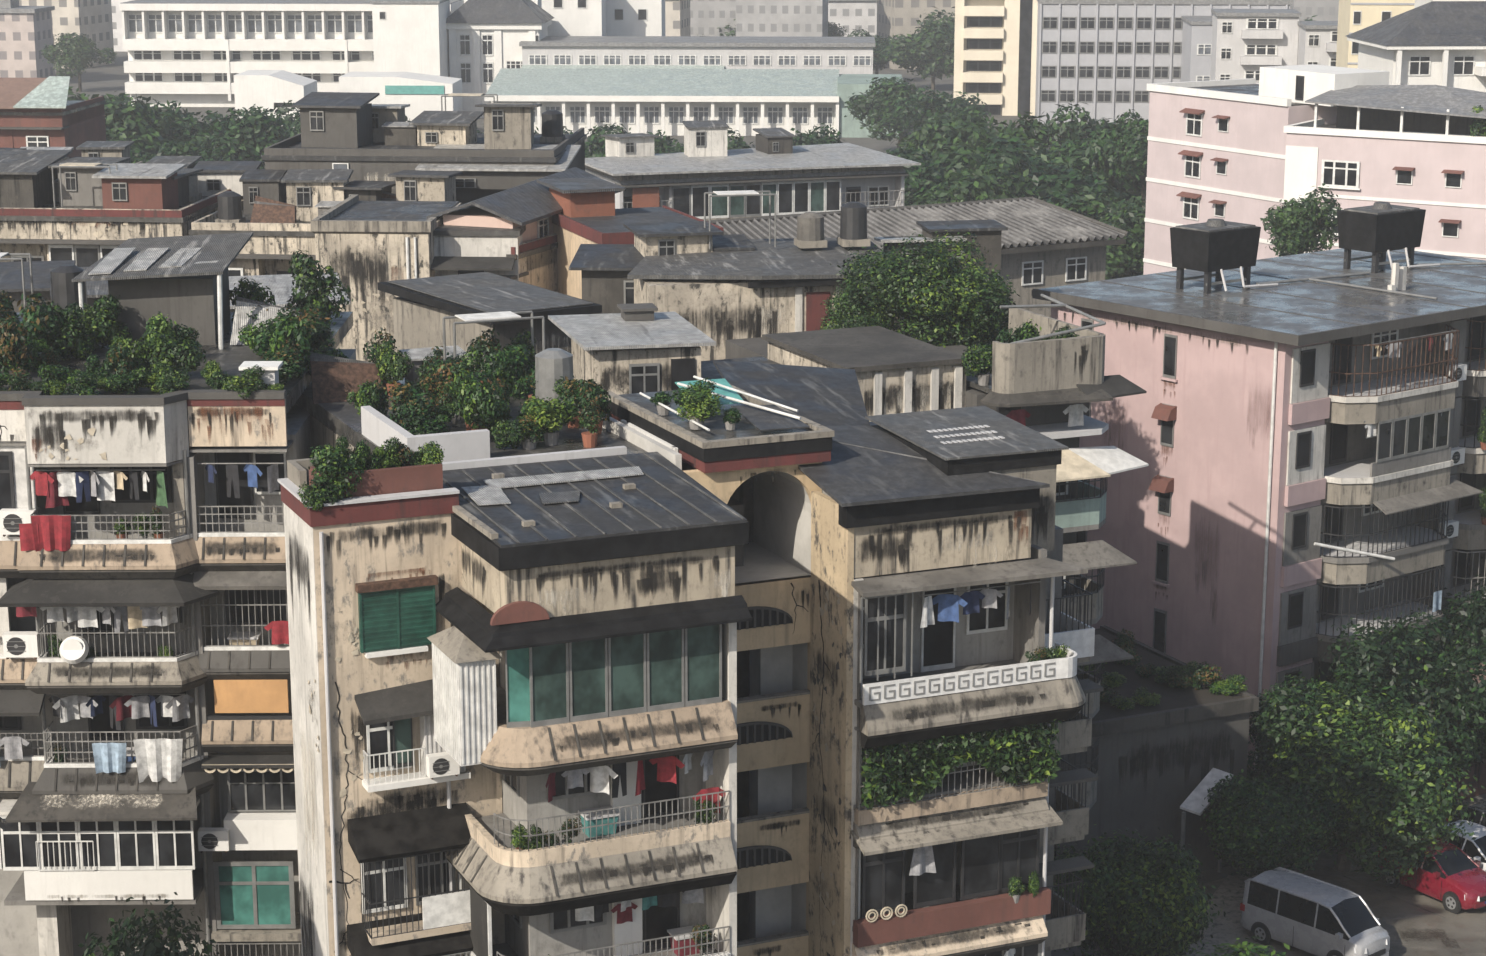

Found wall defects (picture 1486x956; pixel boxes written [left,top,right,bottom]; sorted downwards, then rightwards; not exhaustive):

damp [683,307,777,344]
damp [35,410,158,454]
damp [192,409,271,432]
damp [326,522,446,554]
damp [861,495,1052,567]
damp [536,556,730,603]
crack [329,682,363,952]